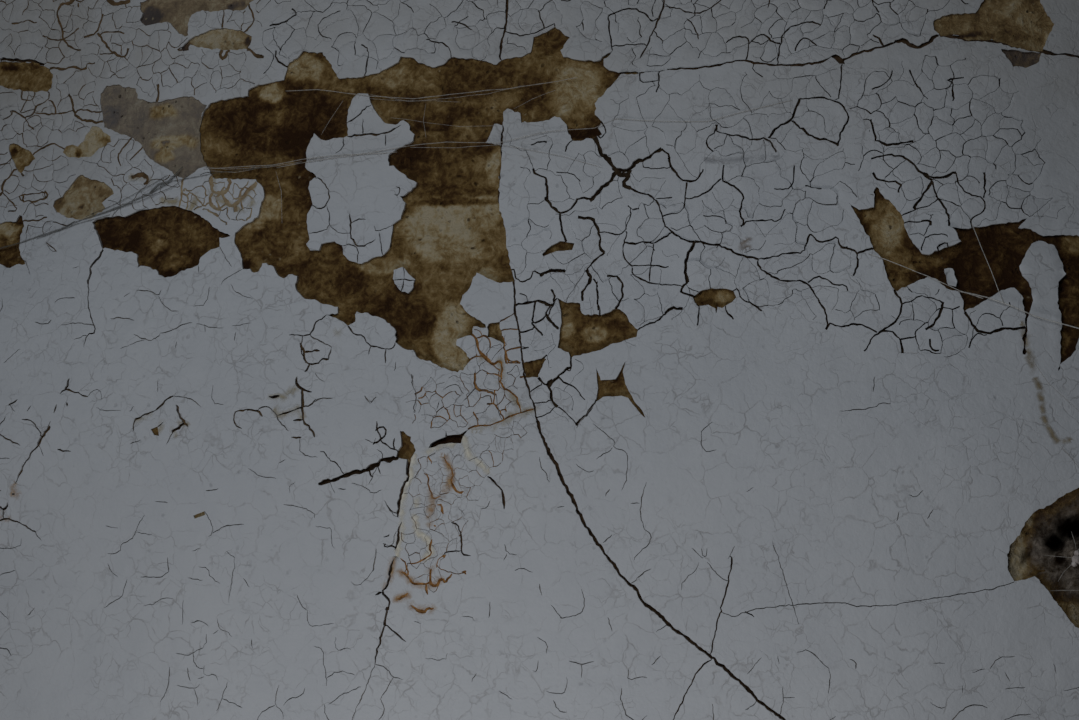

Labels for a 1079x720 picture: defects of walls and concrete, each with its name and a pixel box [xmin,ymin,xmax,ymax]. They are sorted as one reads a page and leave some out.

crack [0,380,101,549]
crack [0,0,264,234]
crack [36,250,248,347]
peeling [141,0,253,51]
crack [210,0,278,32]
crack [104,316,399,493]
peeling [54,27,645,372]
peeling [596,363,645,417]
crack [266,0,1052,720]
peeling [850,188,1079,371]
peeling [933,0,1054,68]
spalling [1007,488,1079,628]